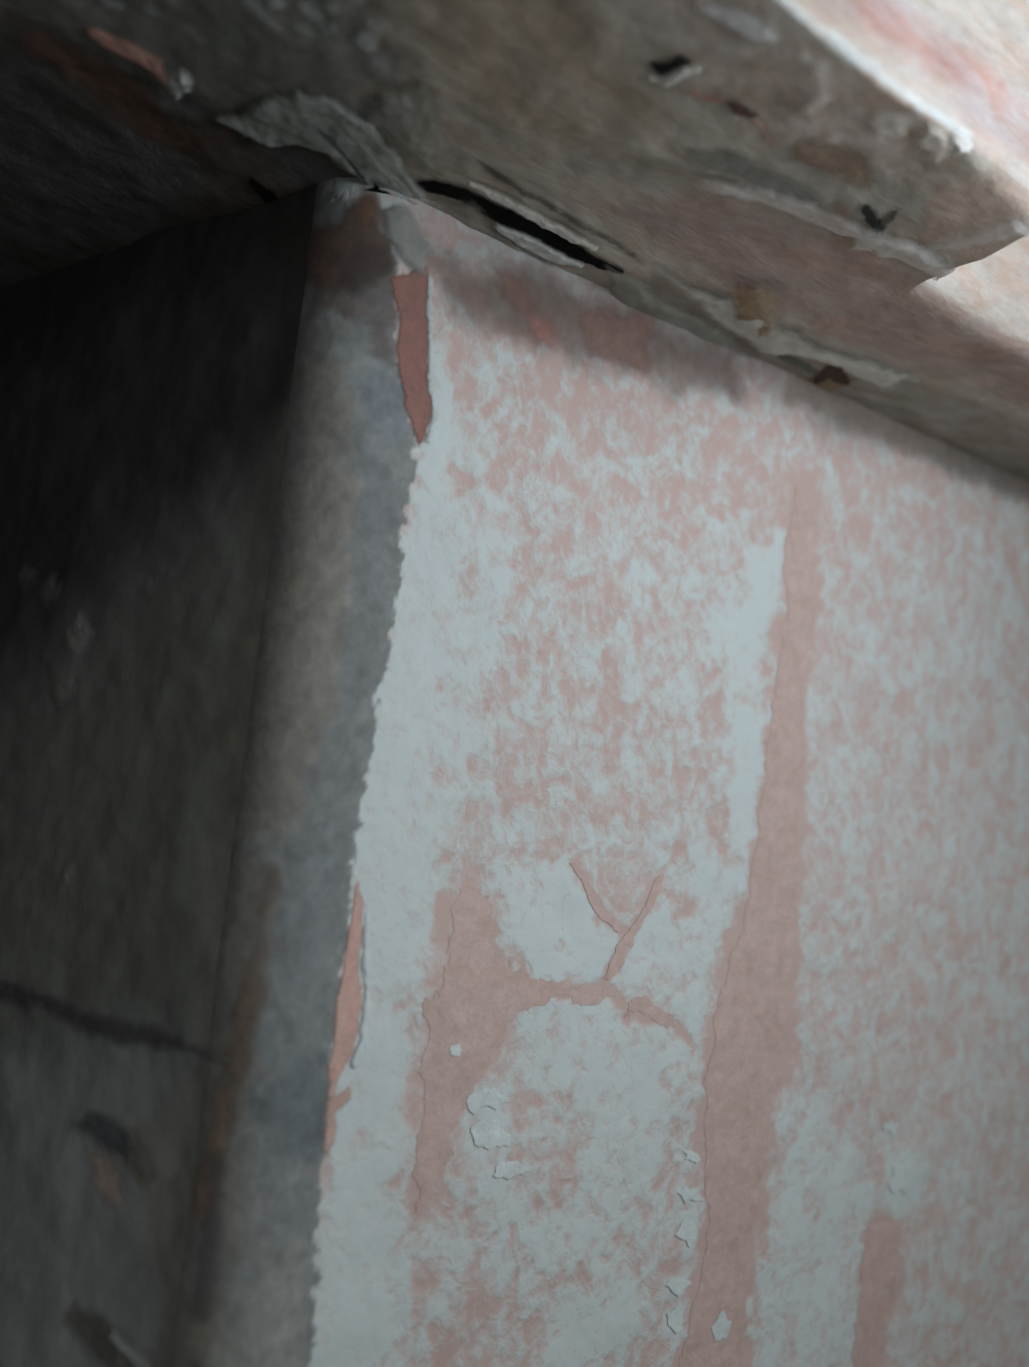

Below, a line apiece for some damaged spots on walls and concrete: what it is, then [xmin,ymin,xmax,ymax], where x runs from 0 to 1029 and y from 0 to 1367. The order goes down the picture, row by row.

damp [6,0,386,120]
spalling [648,55,700,87]
peeling [702,6,775,42]
crack [317,128,643,274]
spalling [852,205,898,251]
peeling [391,267,440,445]
crack [0,982,227,1061]
peeling [324,884,370,1155]
peeling [412,863,675,1214]
peeling [851,1218,902,1367]